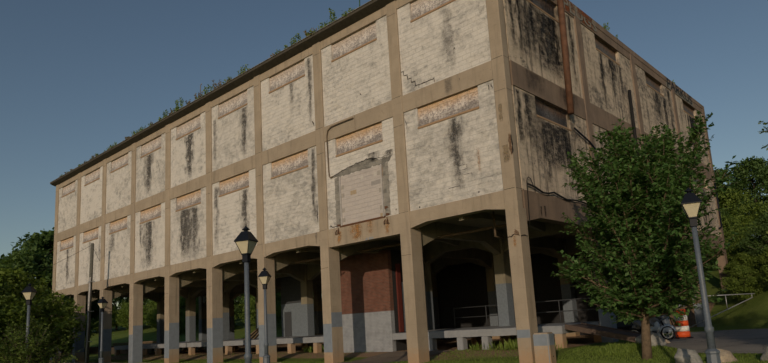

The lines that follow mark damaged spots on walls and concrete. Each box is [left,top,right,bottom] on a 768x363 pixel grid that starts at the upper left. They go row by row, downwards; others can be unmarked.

damp [508,0,576,73]
damp [516,89,574,177]
damp [600,54,622,95]
damp [653,91,674,129]
damp [181,208,197,250]
peeling [331,154,397,235]